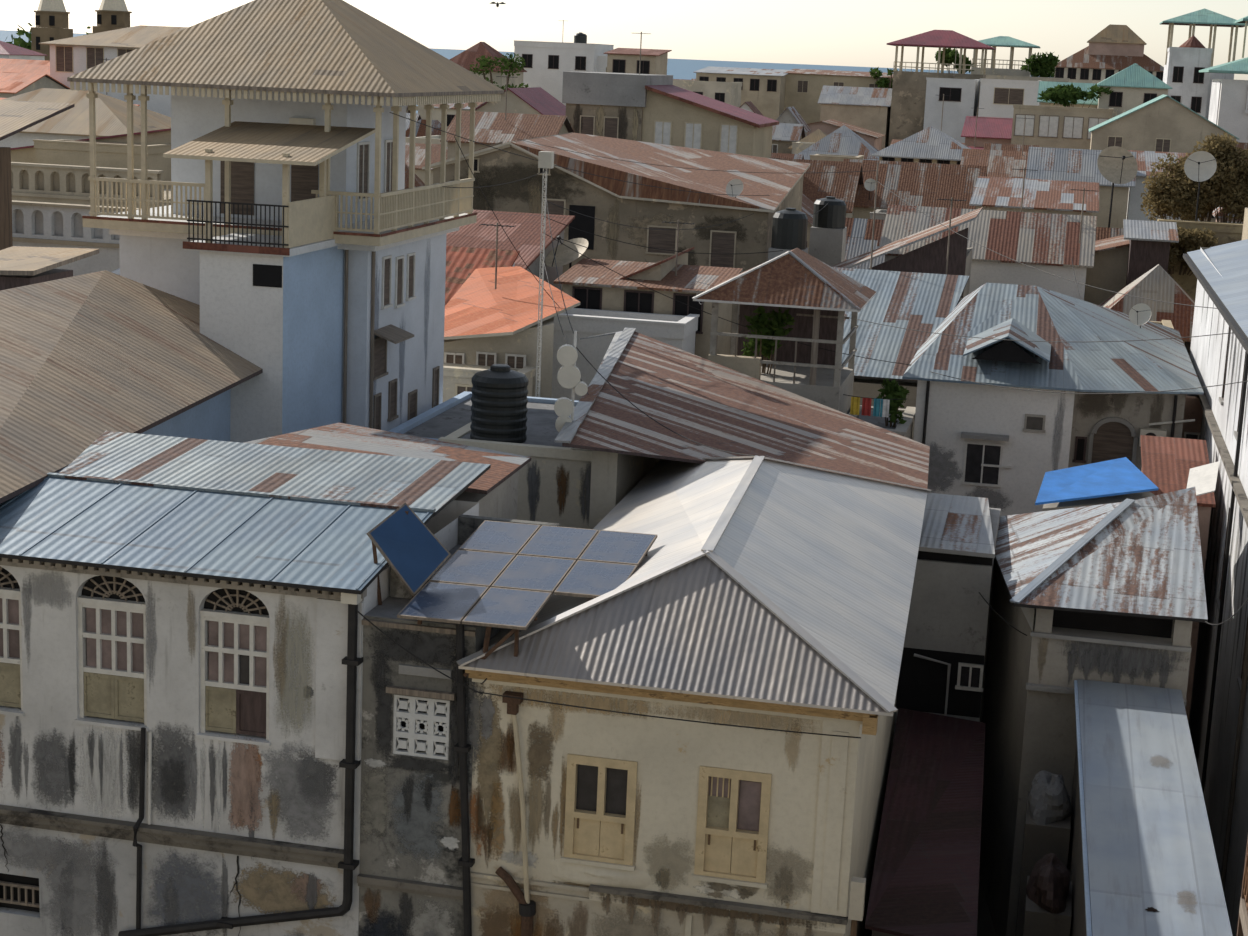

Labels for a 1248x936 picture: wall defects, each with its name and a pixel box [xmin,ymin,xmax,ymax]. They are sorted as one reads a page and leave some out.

damp [1064,641,1180,688]
damp [8,717,227,821]
peeling [228,739,263,838]
damp [265,747,337,840]
damp [498,723,567,856]
crack [0,824,9,870]
damp [0,835,116,936]
damp [596,868,826,936]